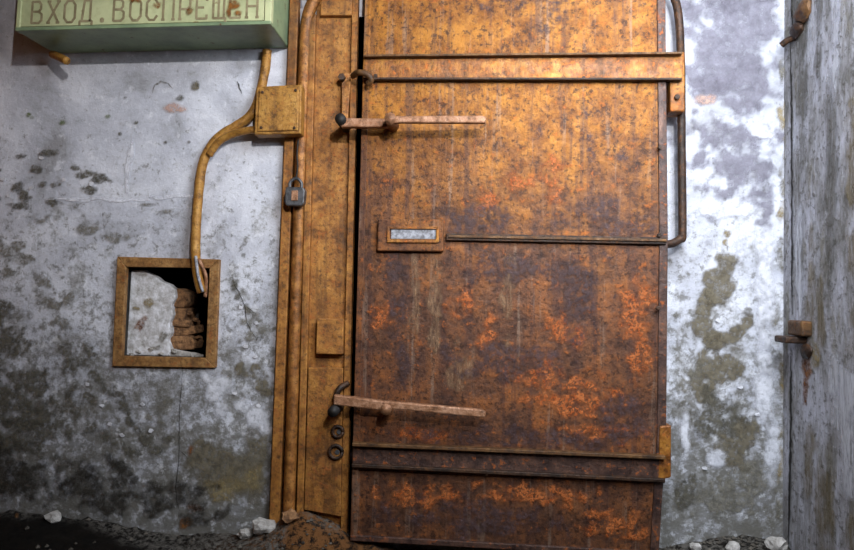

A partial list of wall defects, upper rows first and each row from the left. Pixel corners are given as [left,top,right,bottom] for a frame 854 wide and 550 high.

leakage [798,0,838,121]
leakage [825,56,839,232]
leakage [0,240,35,277]
leakage [675,0,784,516]
leakage [795,210,829,344]
leakage [0,300,272,525]
corrosion [476,313,496,348]
corrosion [514,358,628,440]
corrosion [619,279,657,374]
corrosion [802,344,820,403]
corrosion [372,483,459,509]
corrosion [484,480,648,540]